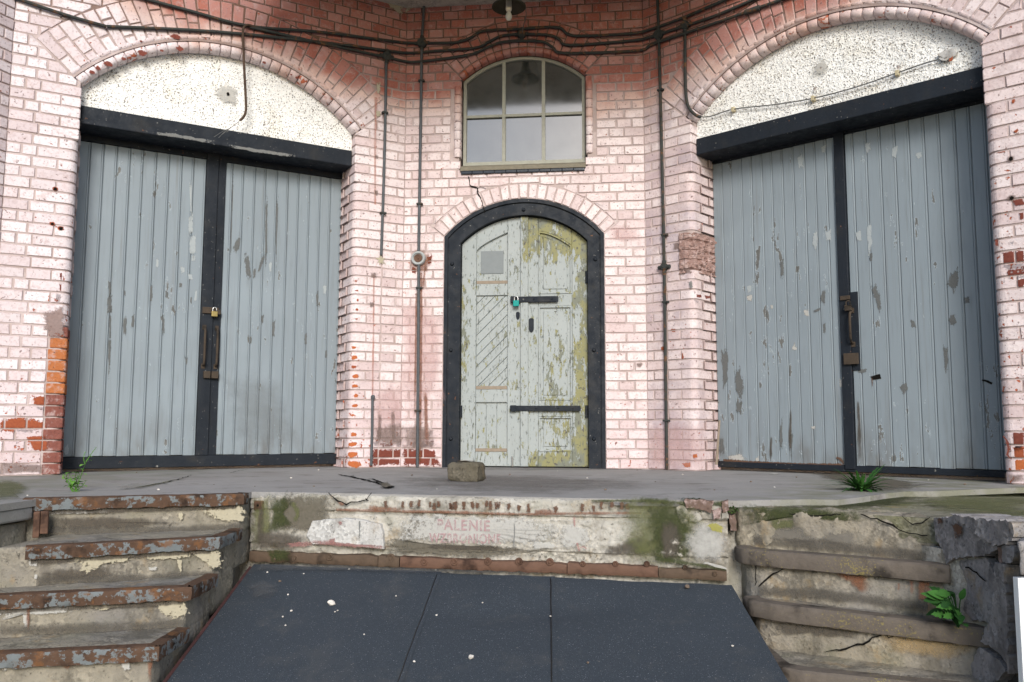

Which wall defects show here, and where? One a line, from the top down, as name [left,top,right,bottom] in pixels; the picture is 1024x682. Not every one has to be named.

crack [468,176,486,212]
peeling [230,174,279,278]
spalling [674,232,717,299]
crack [328,474,394,505]
peeling [204,506,245,522]
peeling [280,492,590,555]
crack [791,514,930,536]
leakage [608,538,654,554]
peeling [73,551,224,574]
peeling [0,605,109,627]
peeling [158,601,189,619]
crack [826,635,893,652]